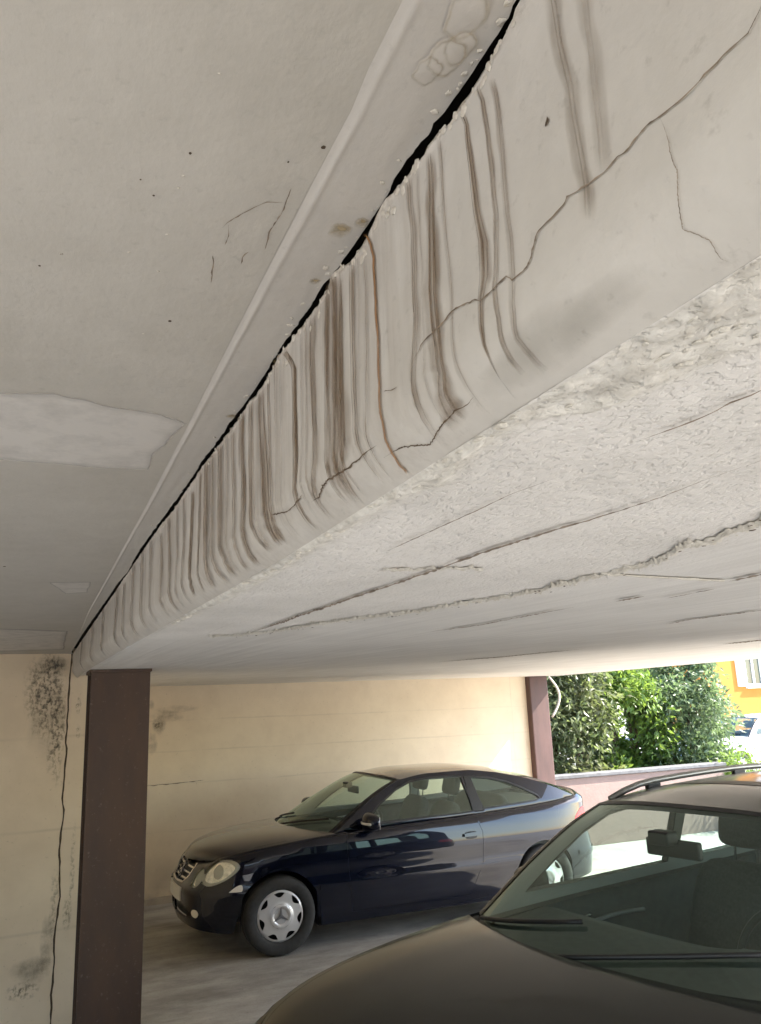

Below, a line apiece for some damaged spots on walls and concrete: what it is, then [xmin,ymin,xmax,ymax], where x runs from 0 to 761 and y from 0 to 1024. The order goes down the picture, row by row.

crack [50,0,520,1024]
rust [365,235,407,472]
damp [429,205,437,294]
crack [259,461,761,630]
crack [412,8,761,361]
crack [645,390,761,439]